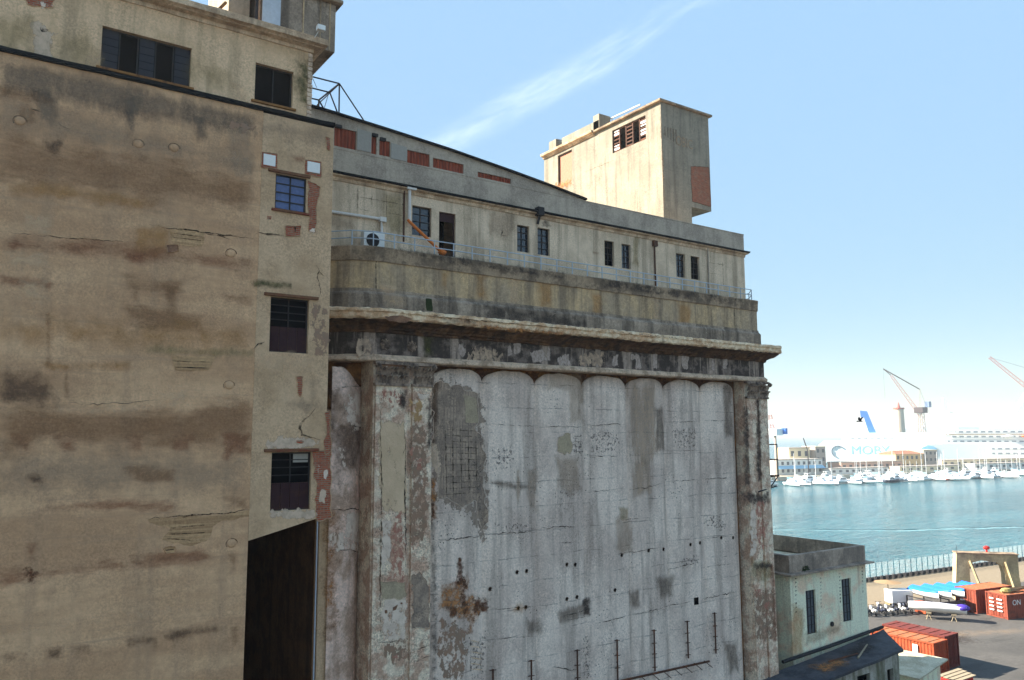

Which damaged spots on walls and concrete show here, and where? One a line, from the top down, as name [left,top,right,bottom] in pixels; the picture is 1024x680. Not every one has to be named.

damp [7,70,249,136]
spalling [284,137,331,237]
crack [166,228,280,239]
peeling [356,336,374,360]
peeling [466,346,503,362]
spalling [266,410,332,522]
spalling [148,510,249,554]
spalling [378,374,532,680]
rust [441,558,489,633]